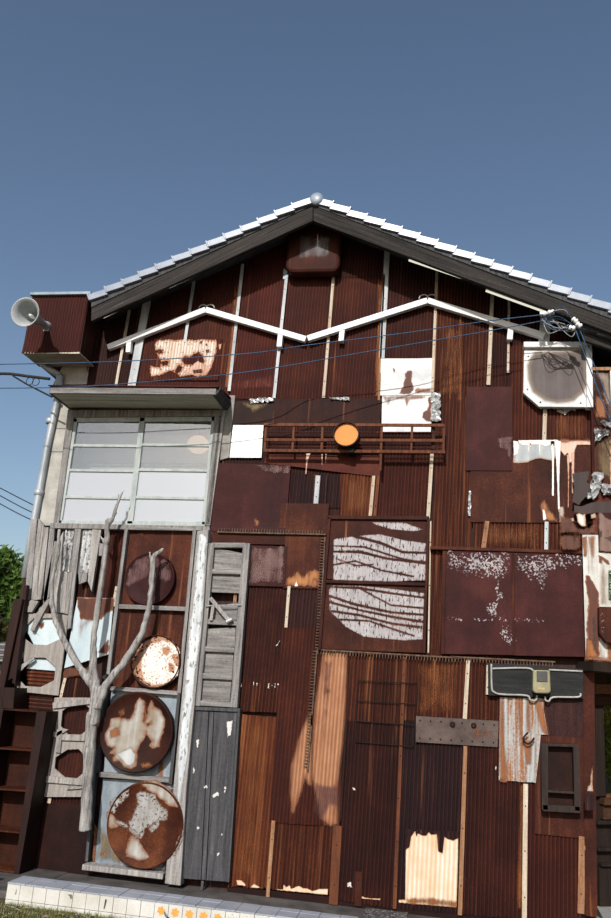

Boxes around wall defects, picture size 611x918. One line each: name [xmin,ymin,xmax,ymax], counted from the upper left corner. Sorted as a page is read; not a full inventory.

peeling [150,339,221,377]
rust [376,280,432,421]
rust [443,316,462,400]
rust [540,420,611,564]
peeling [132,636,180,687]
peeling [329,522,426,641]
peeling [447,550,582,645]
rust [585,575,611,662]
peeling [105,698,165,769]
rust [519,700,548,763]
peeling [106,780,178,861]
peeling [362,832,458,918]